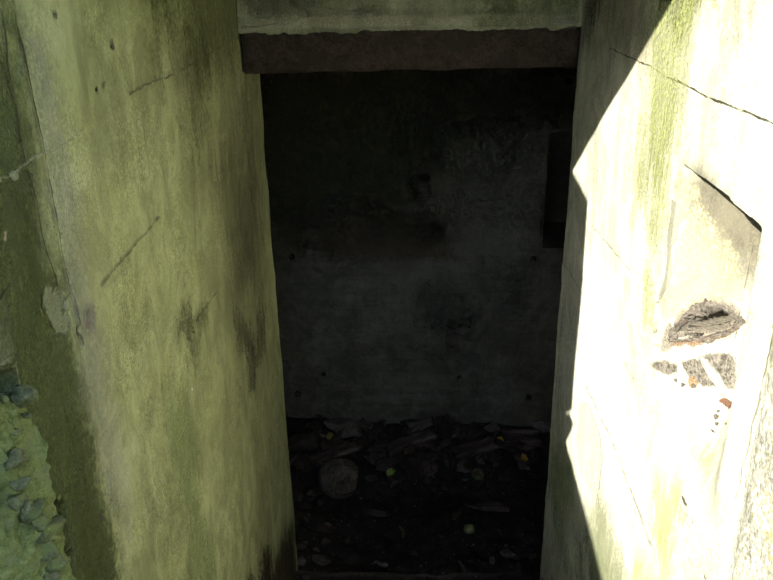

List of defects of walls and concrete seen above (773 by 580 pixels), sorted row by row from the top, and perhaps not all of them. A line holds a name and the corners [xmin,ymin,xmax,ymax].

crack [610,48,773,124]
water stain [234,303,267,394]
spalling [652,352,736,390]
crack [735,325,773,499]
water stain [248,529,297,580]